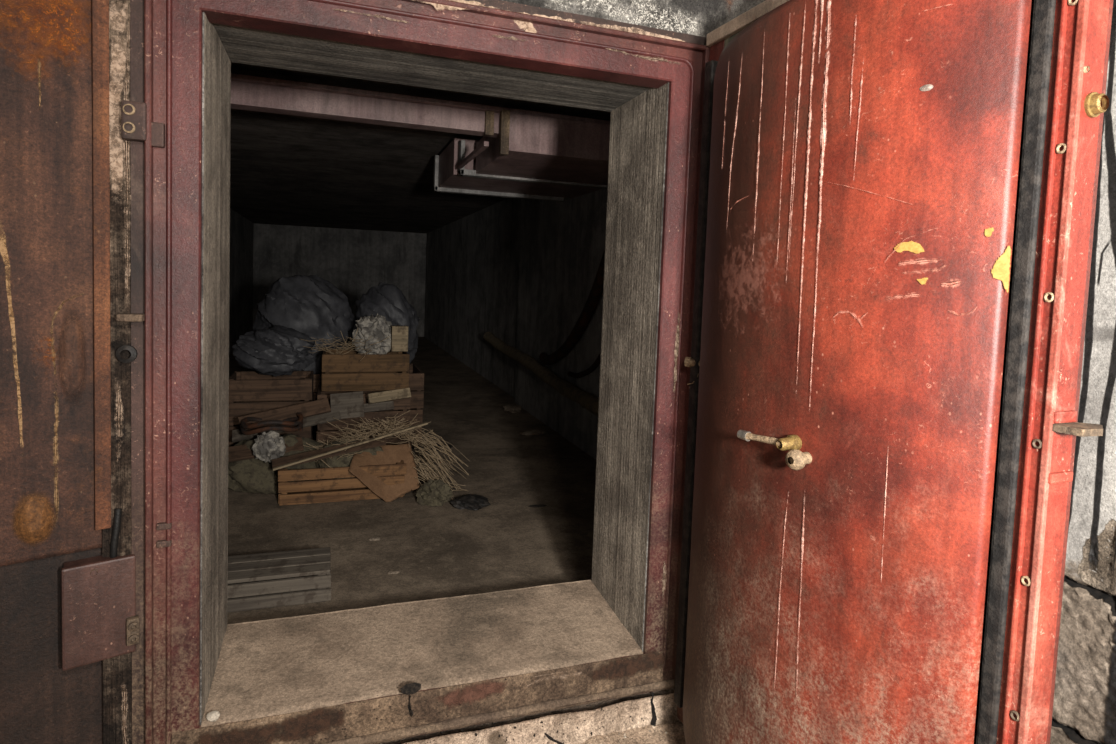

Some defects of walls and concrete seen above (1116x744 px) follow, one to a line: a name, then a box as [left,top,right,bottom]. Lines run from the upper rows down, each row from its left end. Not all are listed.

rust [0,0,92,65]
peeling [426,0,494,10]
peeling [495,12,685,42]
leakage [1067,0,1116,567]
spalling [1078,519,1116,595]
crack [1066,576,1116,616]
leakage [1103,623,1116,744]
crack [1052,719,1101,744]